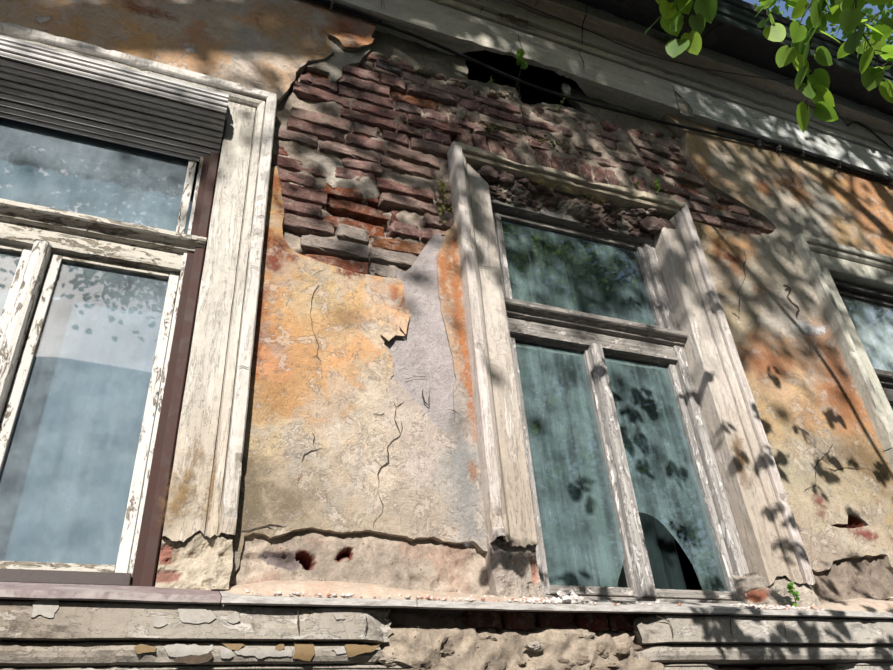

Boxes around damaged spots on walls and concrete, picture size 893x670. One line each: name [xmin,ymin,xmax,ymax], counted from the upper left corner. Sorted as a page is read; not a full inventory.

flaking render [271,29,775,435]
crack [731,247,746,319]
crack [406,376,459,414]
crack [373,403,403,526]
crack [807,445,871,489]
spalling [154,529,546,599]
spalling [732,556,893,607]
peeling [31,600,59,618]
peeling [177,606,216,624]
peeling [227,612,240,624]
peeling [134,641,315,664]
peeling [332,644,379,657]